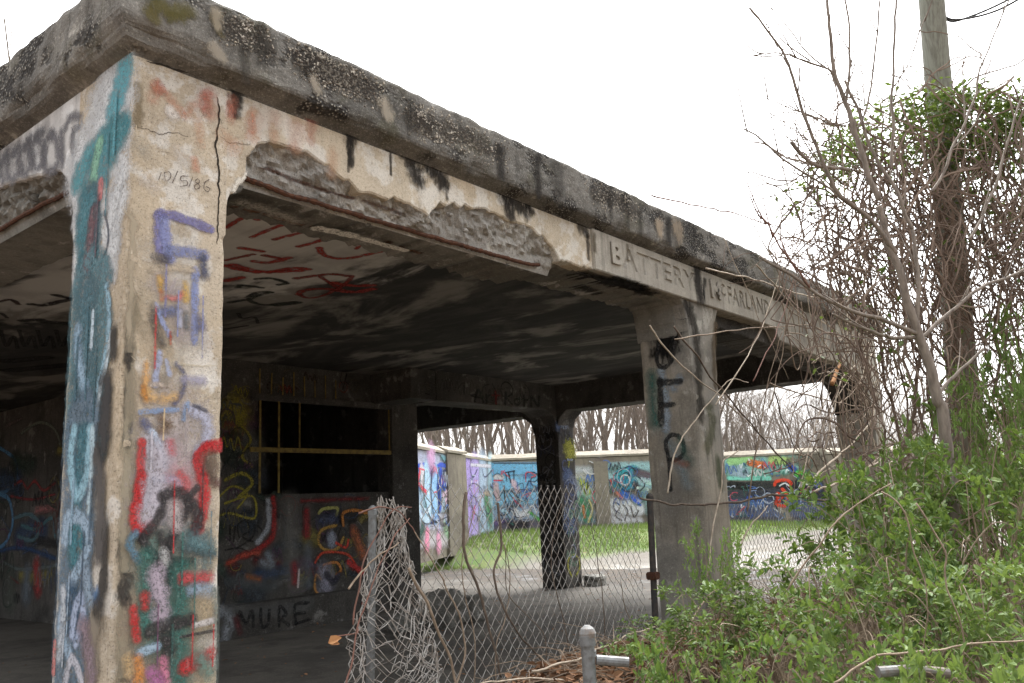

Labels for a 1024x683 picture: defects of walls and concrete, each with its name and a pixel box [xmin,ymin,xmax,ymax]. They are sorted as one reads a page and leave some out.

spalling [0,172,72,243]
crack [147,61,250,242]
water stain [346,134,358,168]
spalling [231,143,553,276]
water stain [389,153,450,199]
water stain [497,145,505,180]
water stain [499,154,542,221]